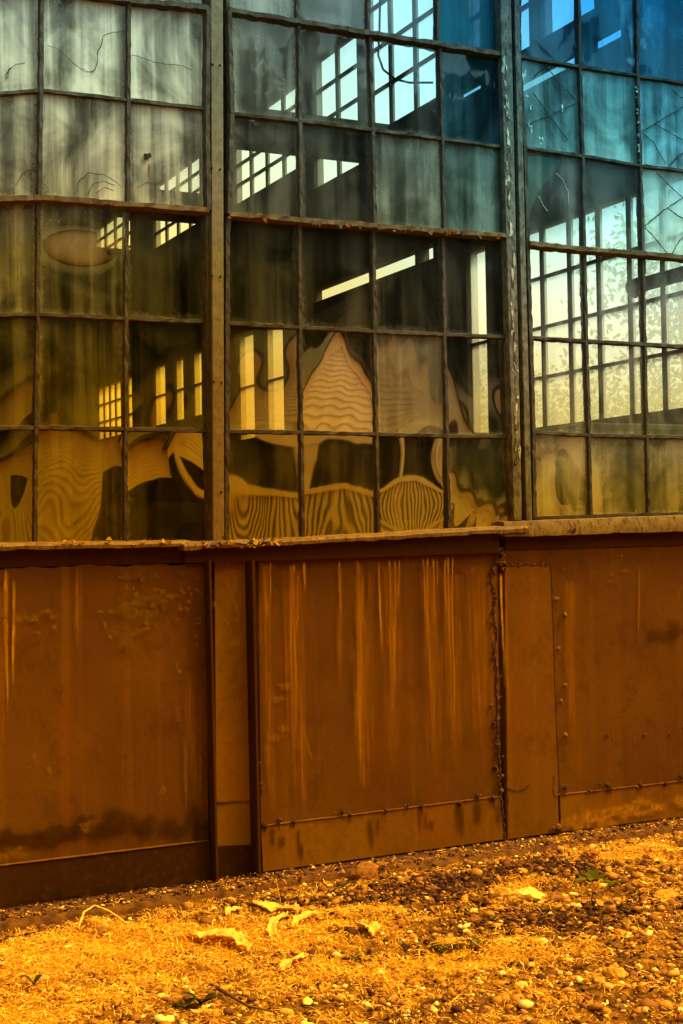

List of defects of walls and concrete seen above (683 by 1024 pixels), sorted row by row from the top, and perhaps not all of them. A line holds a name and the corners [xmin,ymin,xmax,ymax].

corrosion [2,570,15,698]
corrosion [263,562,271,654]
corrosion [267,562,306,787]
corrosion [356,560,400,761]
corrosion [423,557,455,718]
corrosion [471,537,571,838]
damp [0,807,209,850]